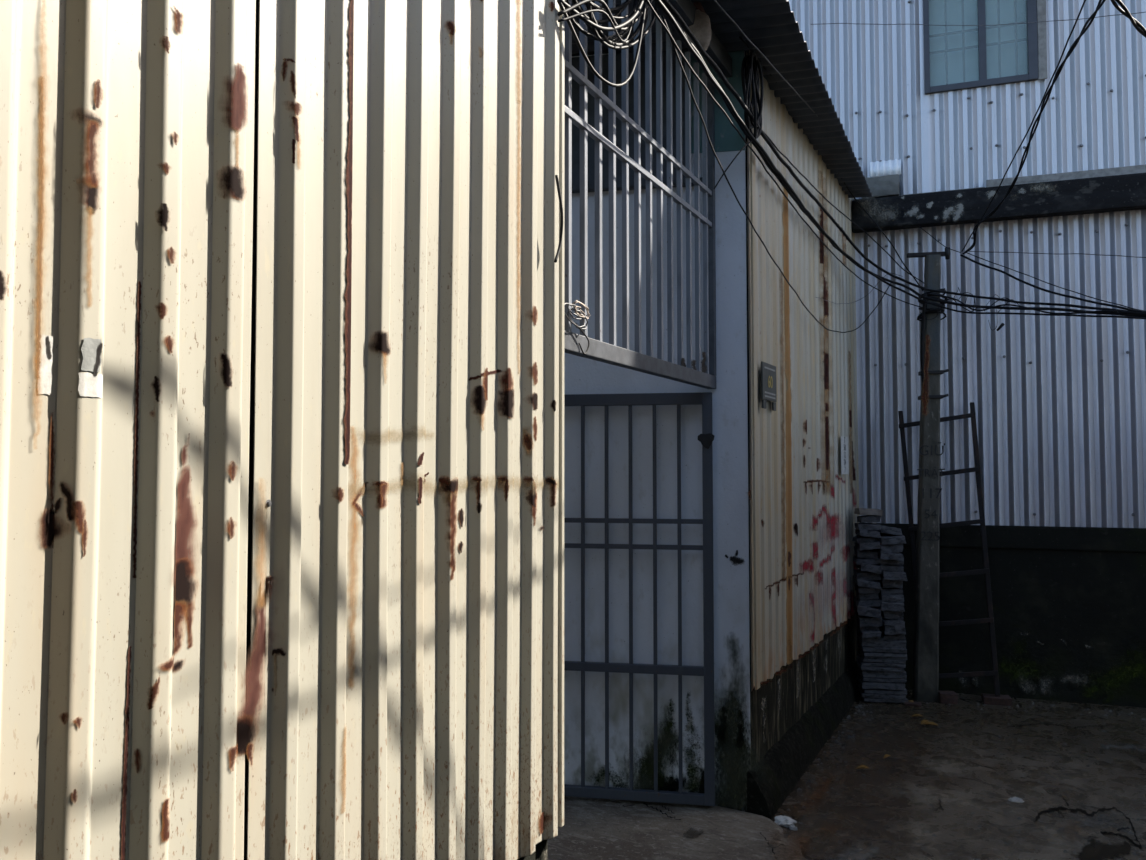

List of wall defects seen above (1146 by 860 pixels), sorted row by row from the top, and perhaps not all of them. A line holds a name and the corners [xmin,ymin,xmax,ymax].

rust [77,79,102,306]
rust [121,646,140,860]
rust [133,281,161,578]
rust [147,433,197,710]
rust [220,63,248,199]
rust [230,486,286,771]
rust [334,0,391,686]
rust [418,452,482,580]
rust [469,0,556,454]
water stain [714,639,781,812]
rust [752,178,856,691]
crack [1034,796,1142,849]